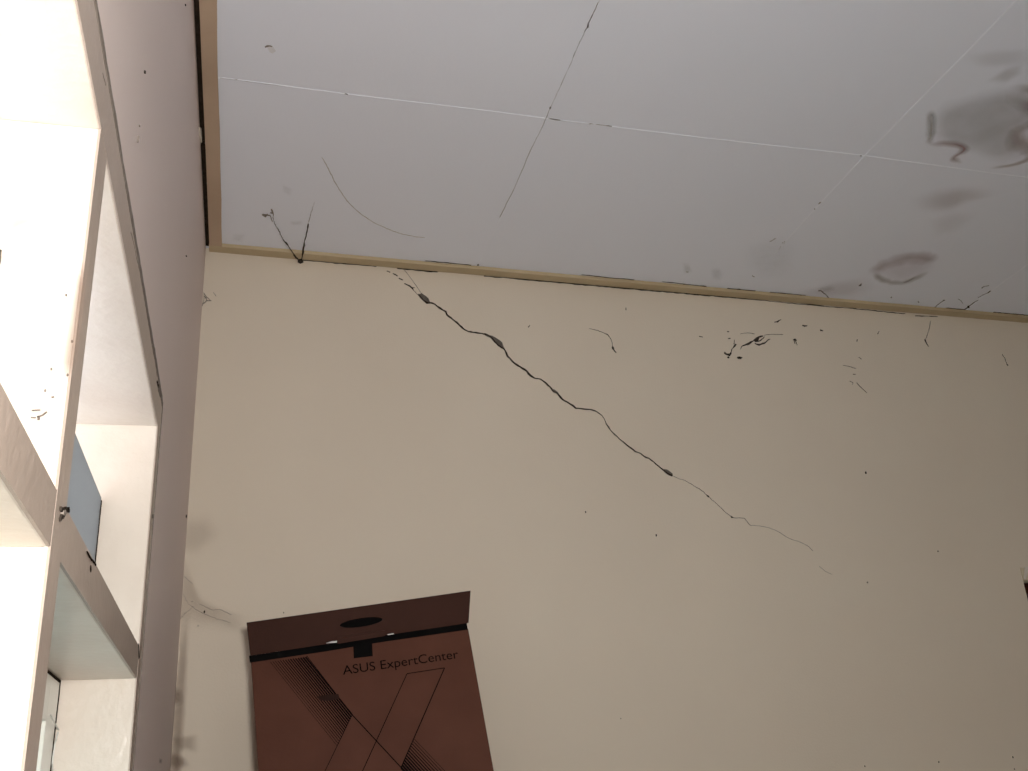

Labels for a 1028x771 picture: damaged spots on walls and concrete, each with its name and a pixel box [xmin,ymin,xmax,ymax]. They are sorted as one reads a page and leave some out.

crack [303,158,1024,573]